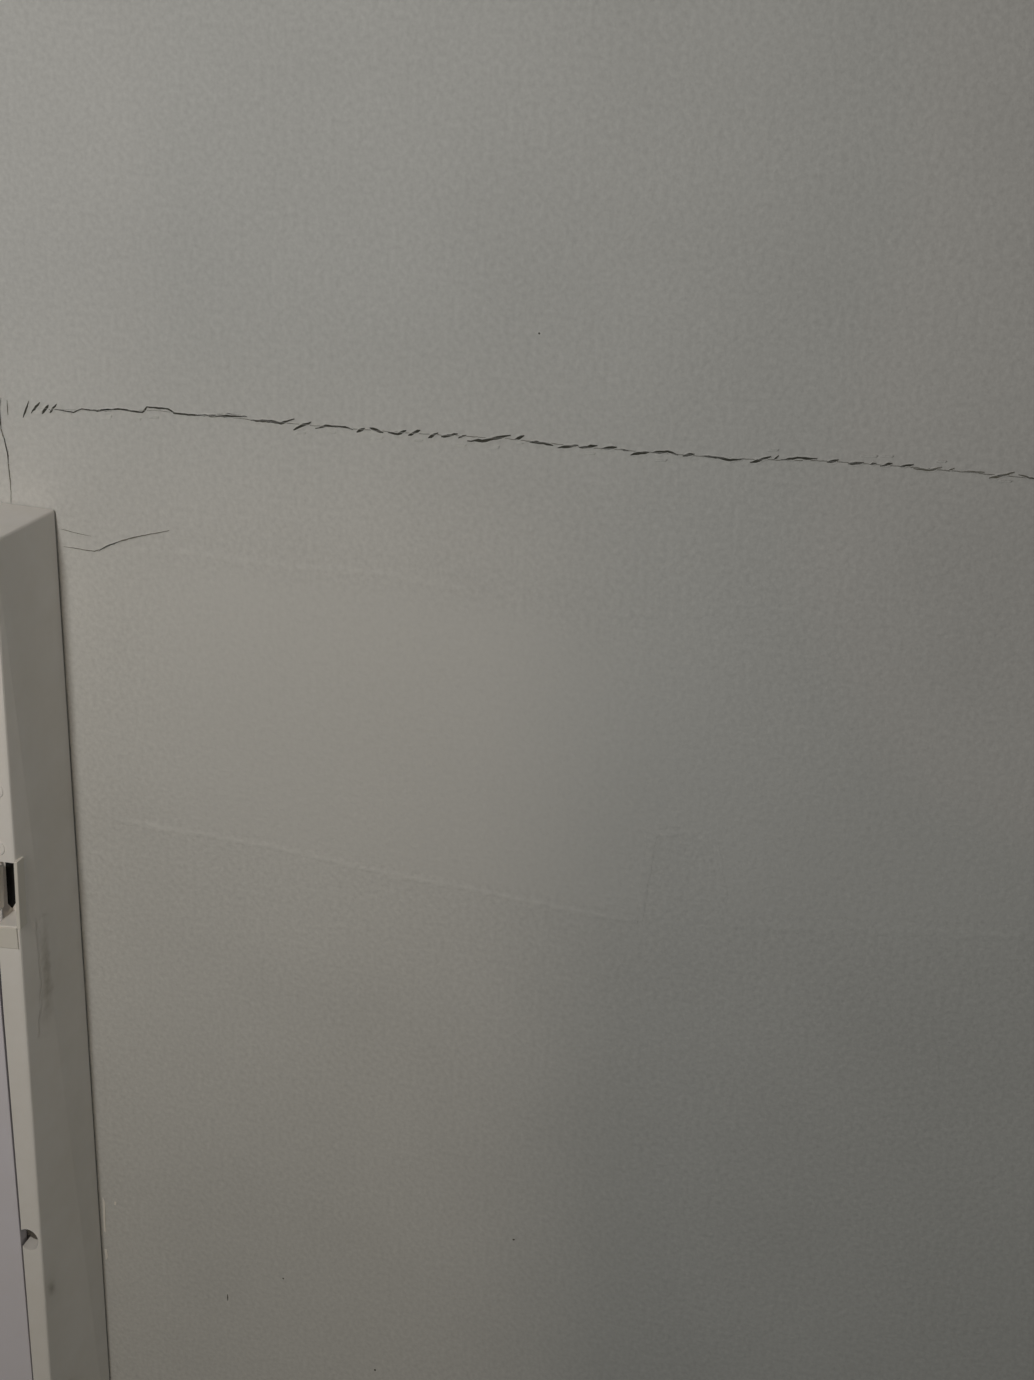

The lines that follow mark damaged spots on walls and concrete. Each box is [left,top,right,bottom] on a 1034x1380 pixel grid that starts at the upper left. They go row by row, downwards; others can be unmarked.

crack [0,397,1034,503]
crack [58,528,169,552]